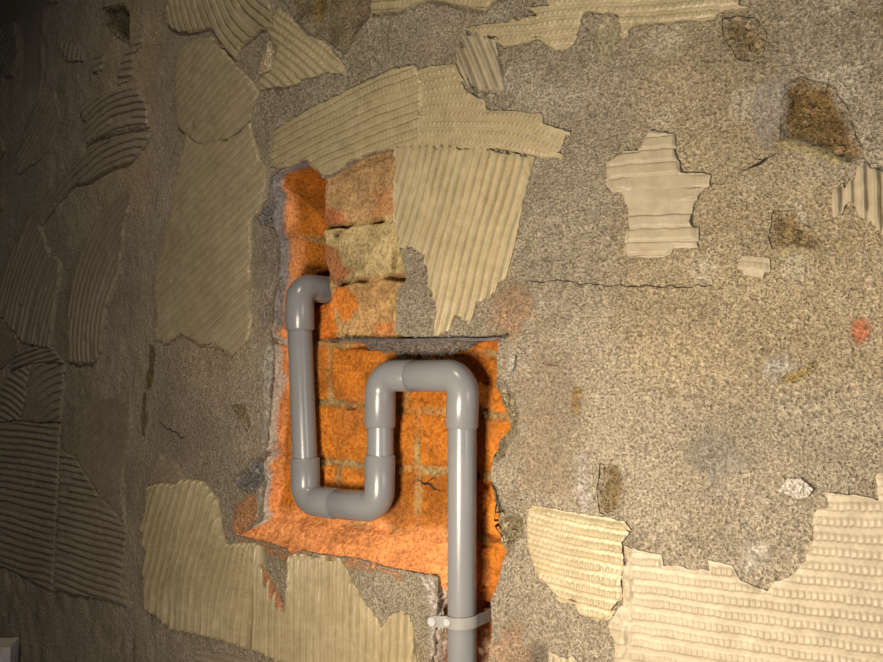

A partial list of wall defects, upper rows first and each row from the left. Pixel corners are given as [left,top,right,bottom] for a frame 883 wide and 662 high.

spalling [283,0,371,54]
spalling [257,167,288,230]
crack [526,279,713,290]
spalling [492,355,519,463]
spalling [234,456,267,494]
spalling [491,478,524,560]